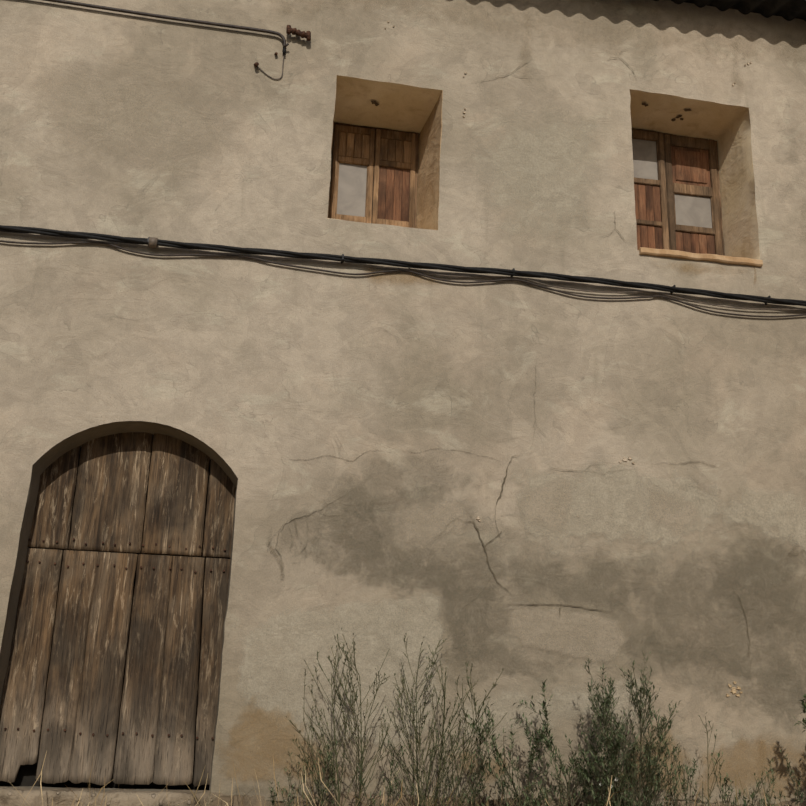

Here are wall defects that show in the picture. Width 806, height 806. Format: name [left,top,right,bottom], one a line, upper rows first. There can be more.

crack [433,362,642,617]
leakage [518,463,806,555]